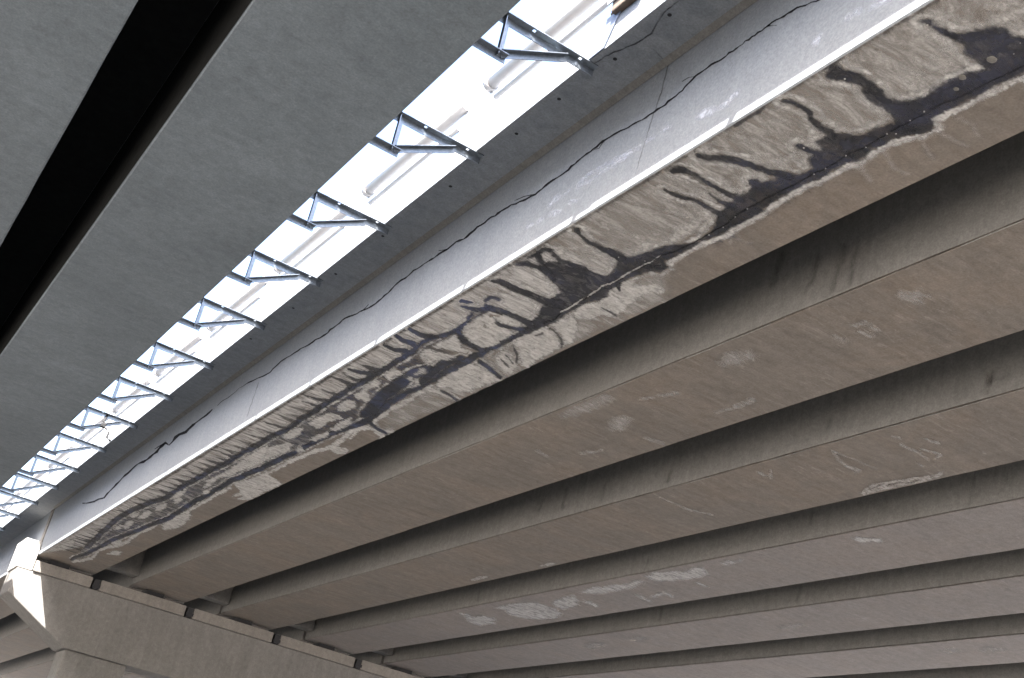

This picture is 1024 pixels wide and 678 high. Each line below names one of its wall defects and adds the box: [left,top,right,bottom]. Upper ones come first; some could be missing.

crack [82,0,820,504]
water stain [46,0,1024,563]
crack [543,43,1024,324]
water stain [459,567,707,626]
spalling [861,472,943,496]